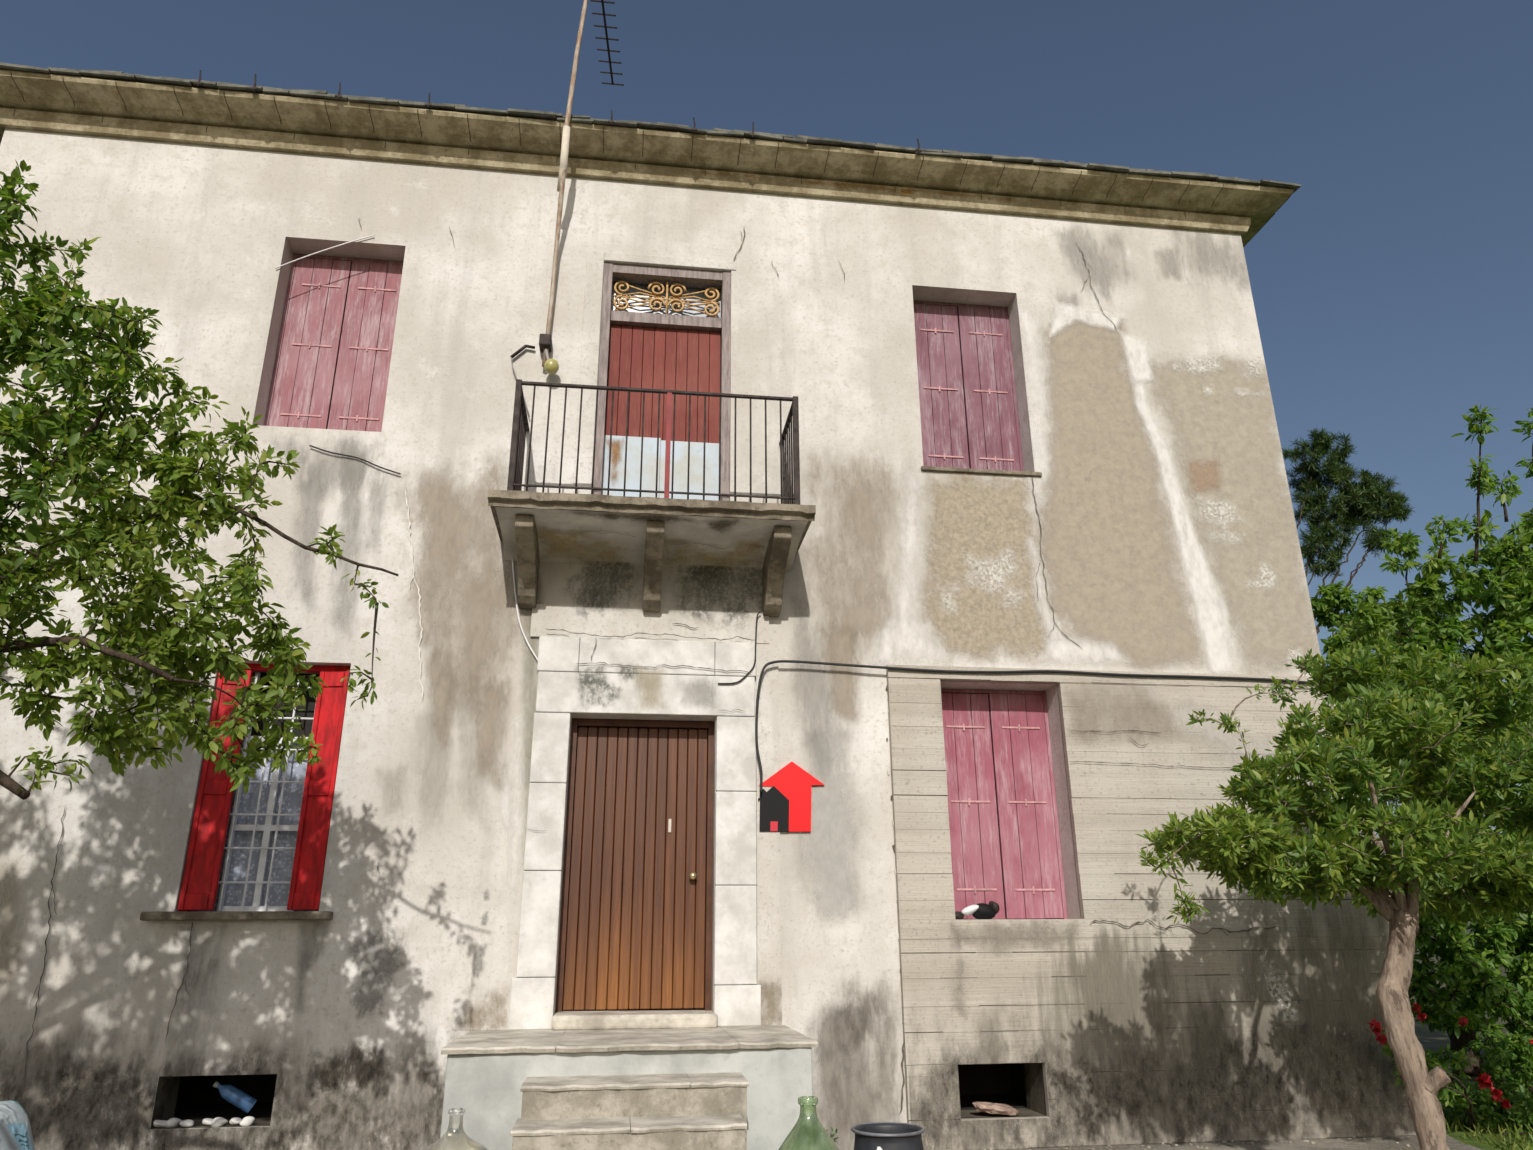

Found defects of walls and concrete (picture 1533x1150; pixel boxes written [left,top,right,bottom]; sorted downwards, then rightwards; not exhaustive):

water stain [537,532,633,607]
water stain [678,543,763,619]
peeling [923,320,1200,667]
water stain [1018,297,1233,673]
peeling [1150,356,1321,668]
crack [23,804,66,1084]
crack [166,921,193,1038]
water stain [0,1035,444,1150]
water stain [351,935,404,1013]
water stain [817,996,891,1150]
water stain [919,935,1410,1150]